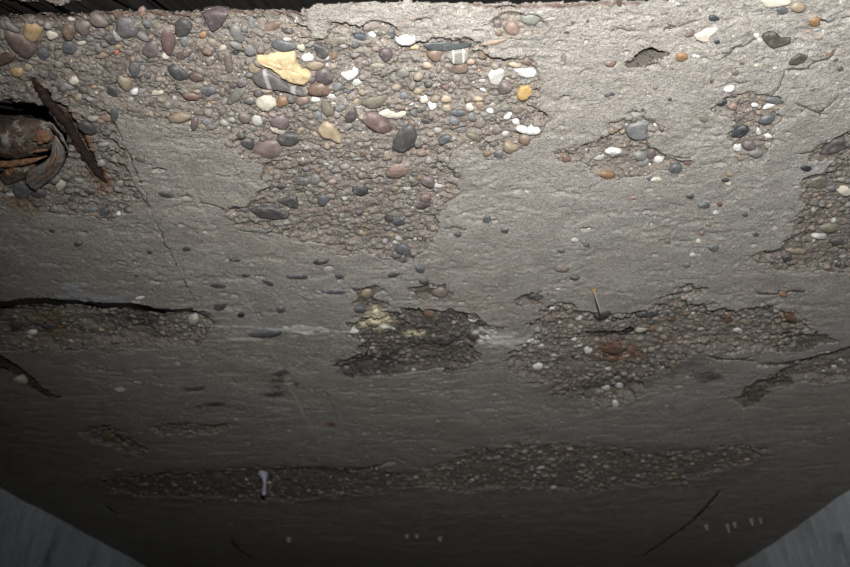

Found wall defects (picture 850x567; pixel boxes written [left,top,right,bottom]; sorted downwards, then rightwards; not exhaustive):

corrosion [0,144,59,180]
spalling [0,0,553,263]
spalling [554,113,693,181]
spalling [710,91,785,161]
crack [0,122,212,317]
spalling [751,131,850,273]
crack [0,355,62,397]
spalling [0,305,216,354]
spalling [352,285,389,313]
spalling [502,283,850,410]
spalling [99,465,410,505]
crack [642,489,721,557]